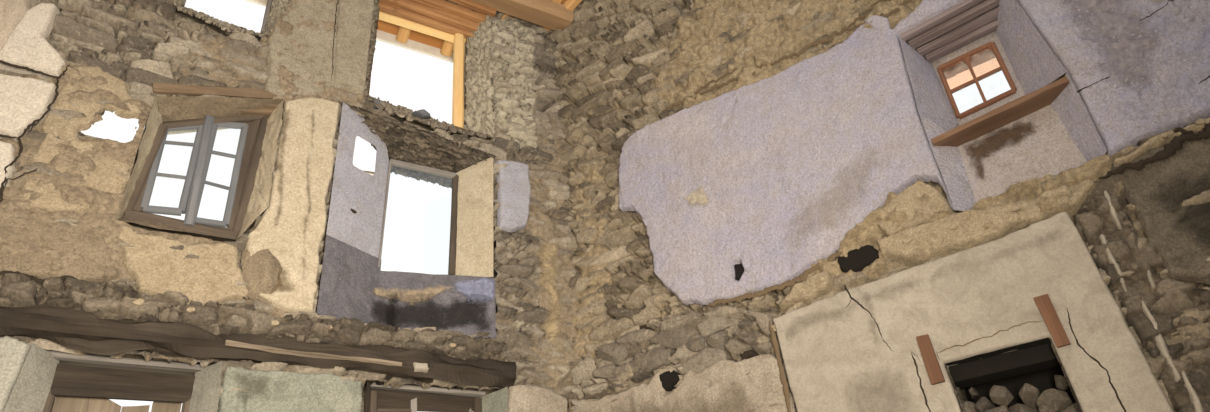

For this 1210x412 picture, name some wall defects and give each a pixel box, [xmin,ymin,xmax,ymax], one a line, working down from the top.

flaking render [865,15,890,31]
crack [1099,122,1210,179]
flaking render [1113,118,1210,167]
flaking render [568,270,834,397]
crack [707,247,1127,412]
flaking render [878,179,1210,412]